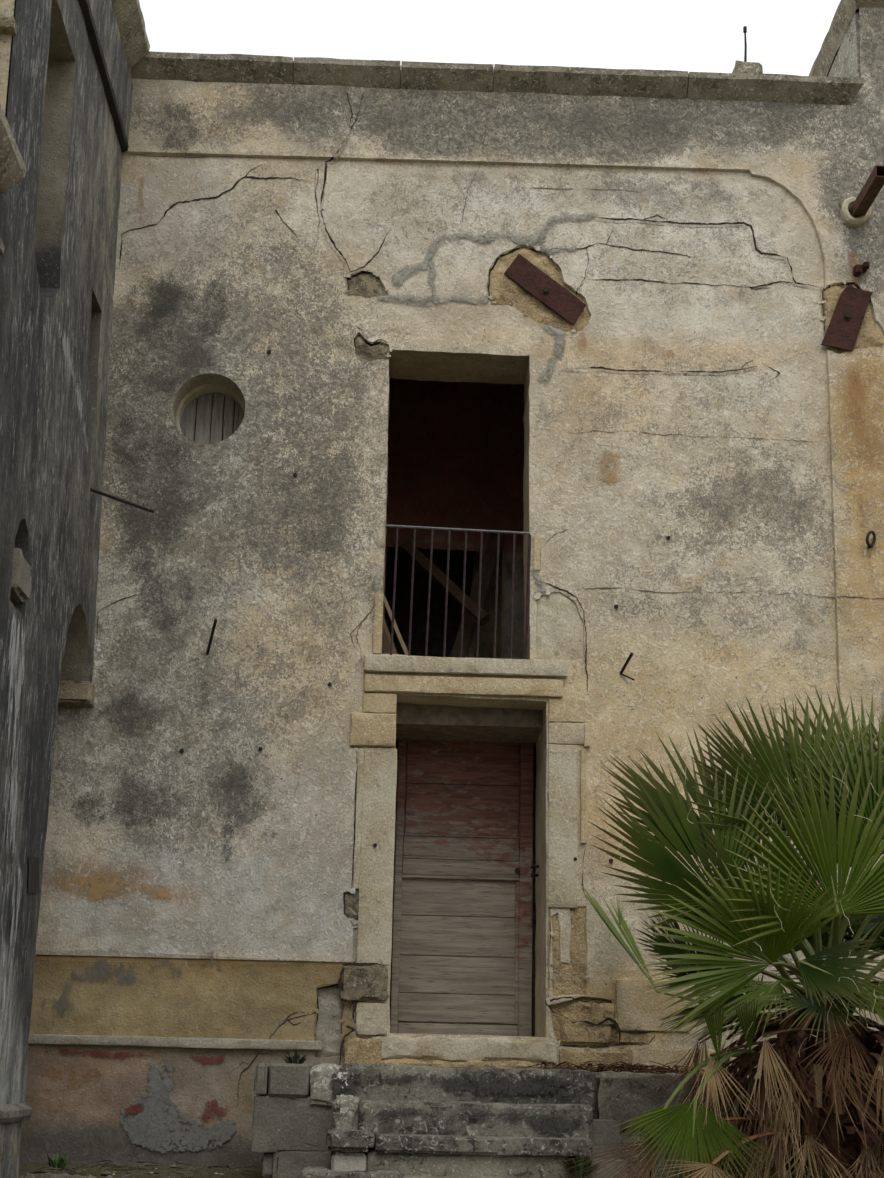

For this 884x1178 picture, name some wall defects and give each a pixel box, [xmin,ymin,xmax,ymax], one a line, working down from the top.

crack [119,92,388,274]
crack [532,187,830,295]
spalling [344,270,389,298]
spalling [354,332,393,361]
spalling [487,244,590,333]
spalling [819,279,884,354]
damp [112,417,200,629]
damp [100,687,165,741]
damp [70,768,196,827]
damp [211,760,275,864]
peeling [201,1099,228,1121]